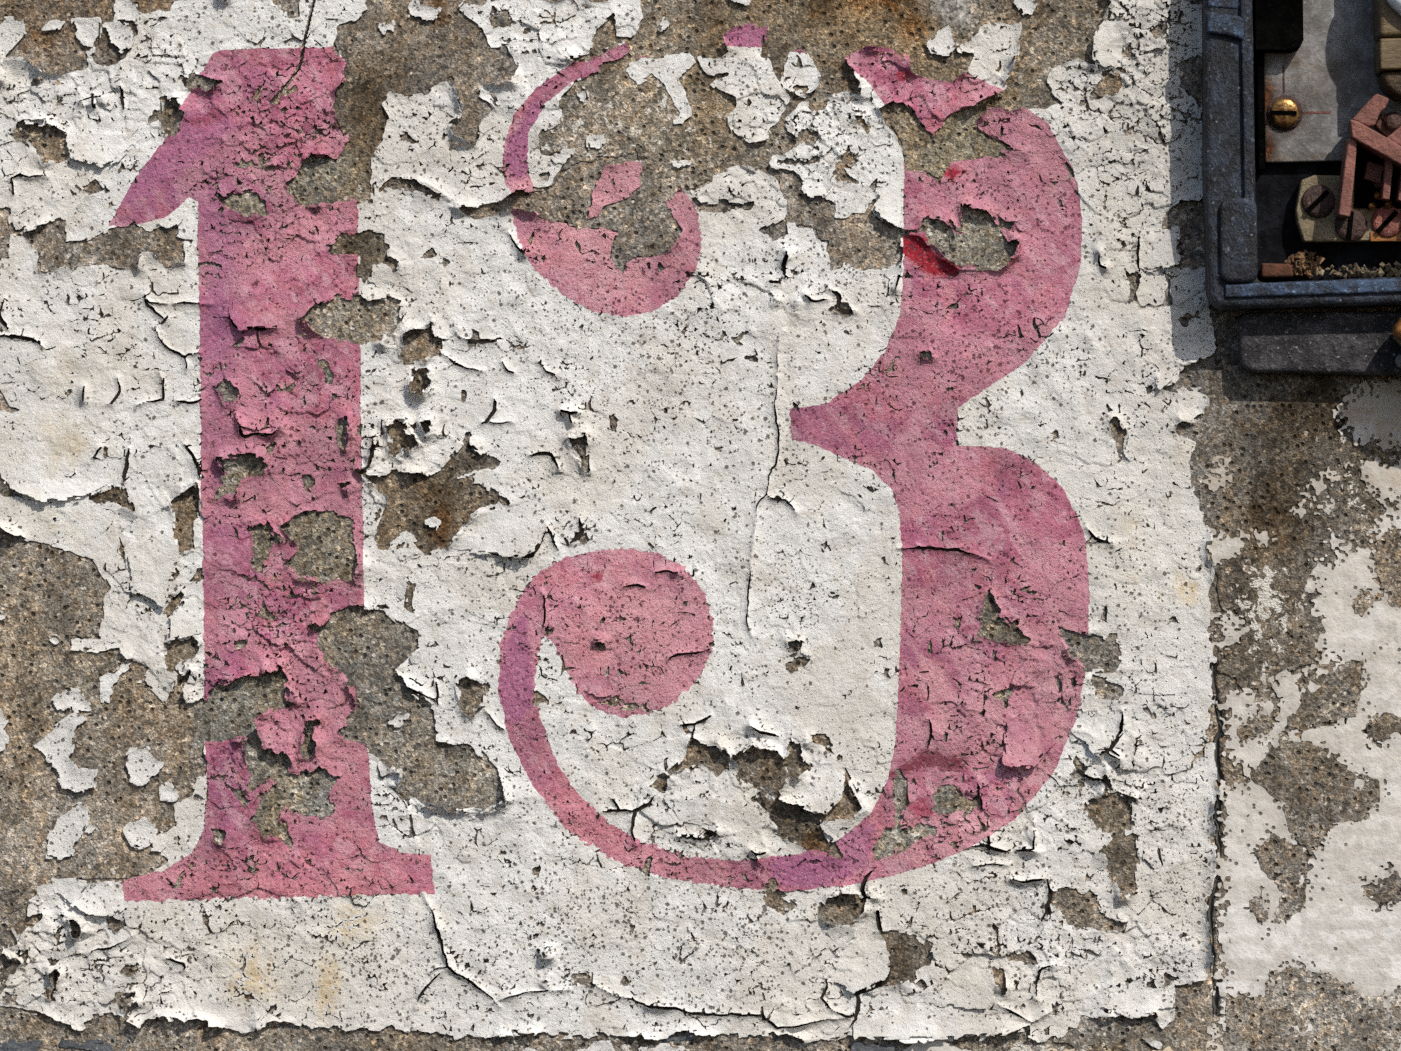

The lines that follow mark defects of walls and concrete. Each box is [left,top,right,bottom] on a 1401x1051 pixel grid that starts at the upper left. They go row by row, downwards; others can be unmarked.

crack [293,0,315,77]
peeling [8,56,223,286]
peeling [776,95,1030,279]
peeling [286,0,546,558]
peeling [0,448,509,938]
crack [416,904,892,1030]
peeling [641,733,862,872]
crack [860,867,882,930]
peeling [817,894,1041,1040]
peeling [1046,774,1144,936]
peeling [1216,566,1401,923]
peeling [1223,967,1401,1051]